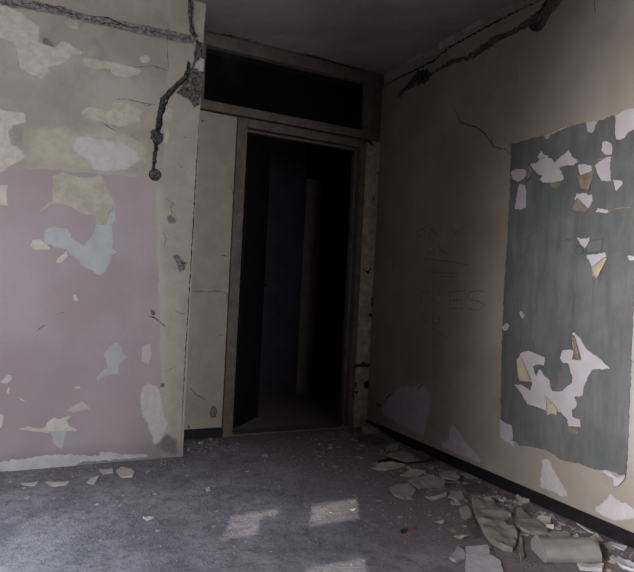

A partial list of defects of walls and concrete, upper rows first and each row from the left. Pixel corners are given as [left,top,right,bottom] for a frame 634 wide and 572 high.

peeling [0,4,150,79]
crack [0,0,257,70]
crack [382,0,539,89]
peeling [0,109,26,172]
flaking render [150,40,204,169]
peeling [511,108,634,213]
peeling [31,172,117,275]
peeling [577,237,606,267]
peeling [514,333,610,427]
peeling [0,401,147,471]
peeling [500,419,514,446]
flaking render [540,458,567,497]